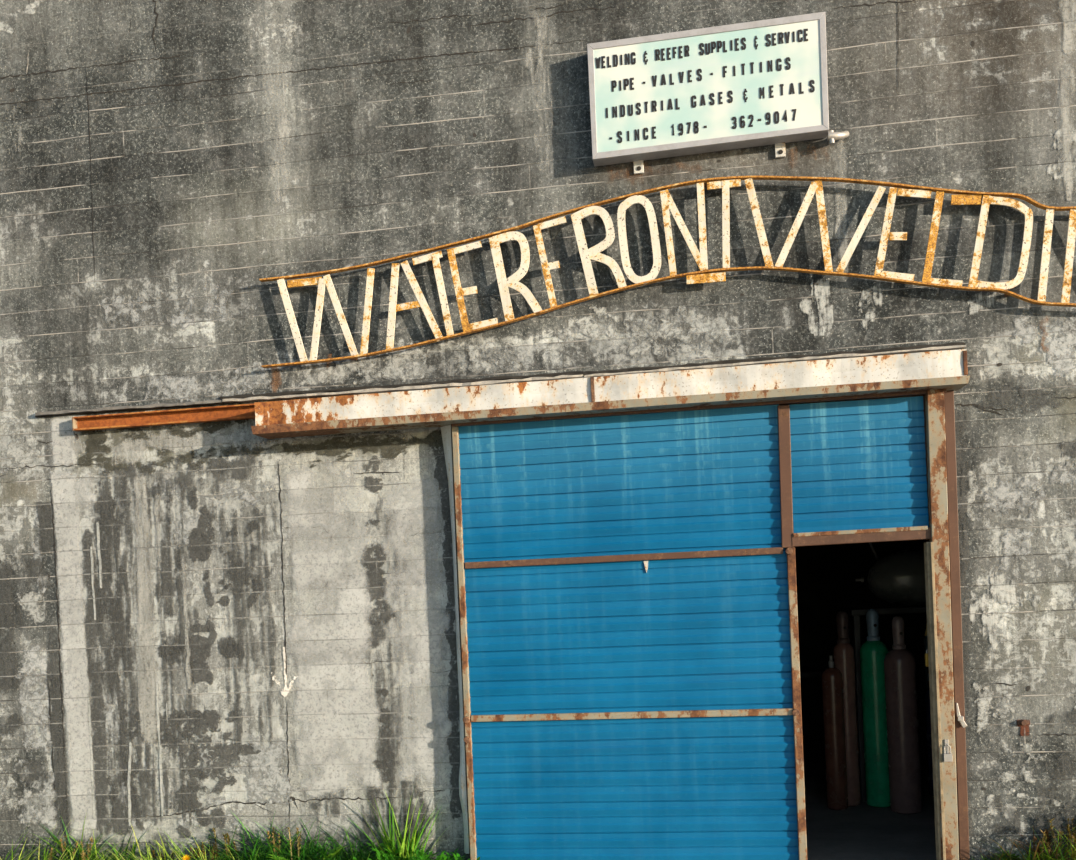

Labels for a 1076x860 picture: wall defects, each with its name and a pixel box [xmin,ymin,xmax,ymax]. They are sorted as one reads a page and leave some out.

crack [0,0,615,271]
crack [956,393,1076,415]
water stain [0,418,463,842]